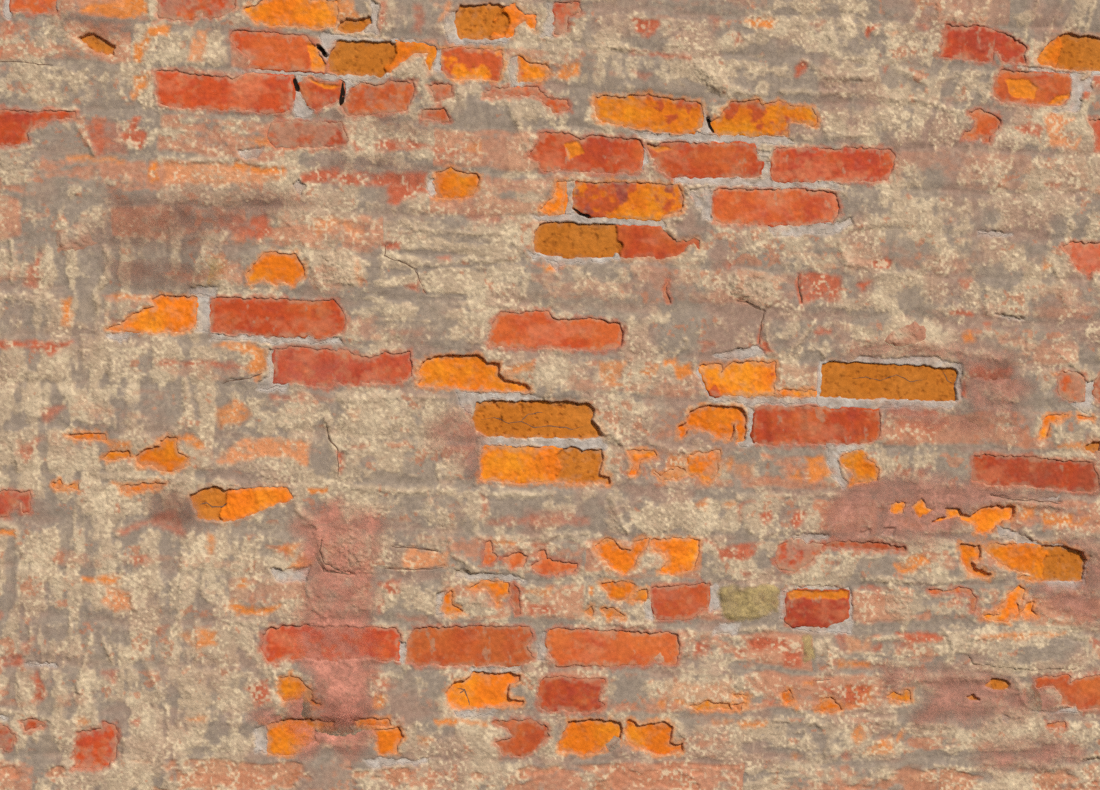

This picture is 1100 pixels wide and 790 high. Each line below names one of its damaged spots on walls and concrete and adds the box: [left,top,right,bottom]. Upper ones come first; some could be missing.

peeling [156,0,570,123]
peeling [940,25,1100,106]
spalling [529,95,895,260]
peeling [246,252,305,286]
spalling [191,486,293,522]
peeling [107,295,623,484]
peeling [261,580,533,709]
peeling [483,537,710,757]
peeling [784,588,850,628]
peeling [678,361,957,486]
spalling [890,499,1084,622]
peeling [972,442,1099,492]